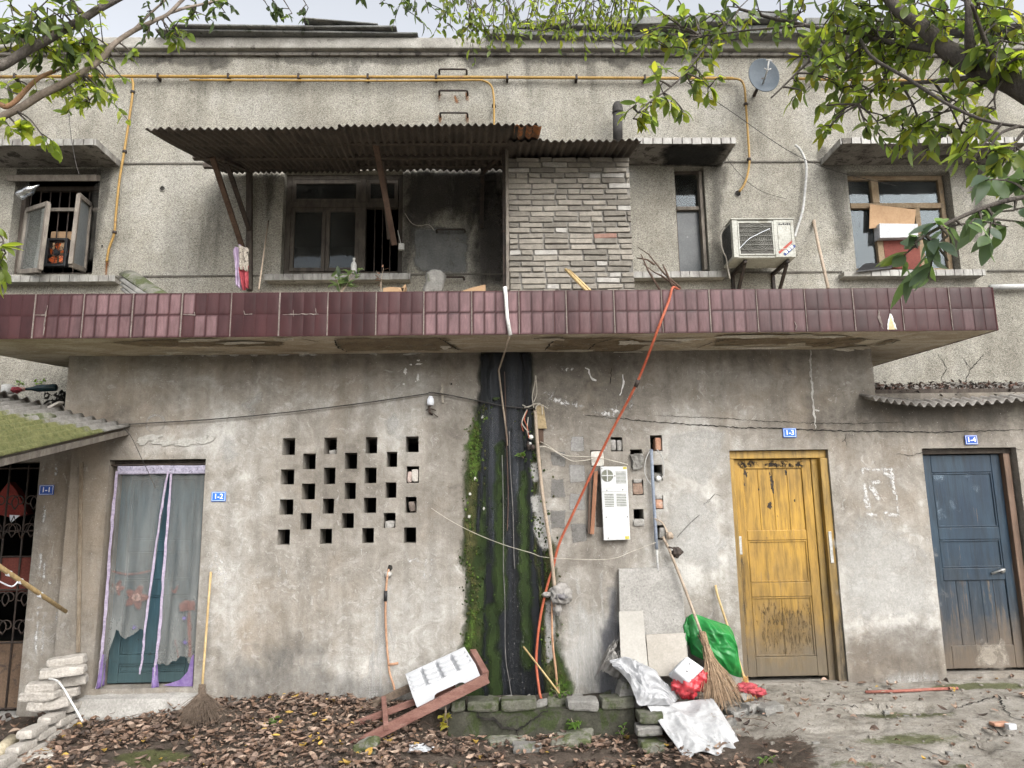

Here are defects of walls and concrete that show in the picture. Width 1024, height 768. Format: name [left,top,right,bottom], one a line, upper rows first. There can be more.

leakage [456,352,619,696]
crack [586,350,1024,456]